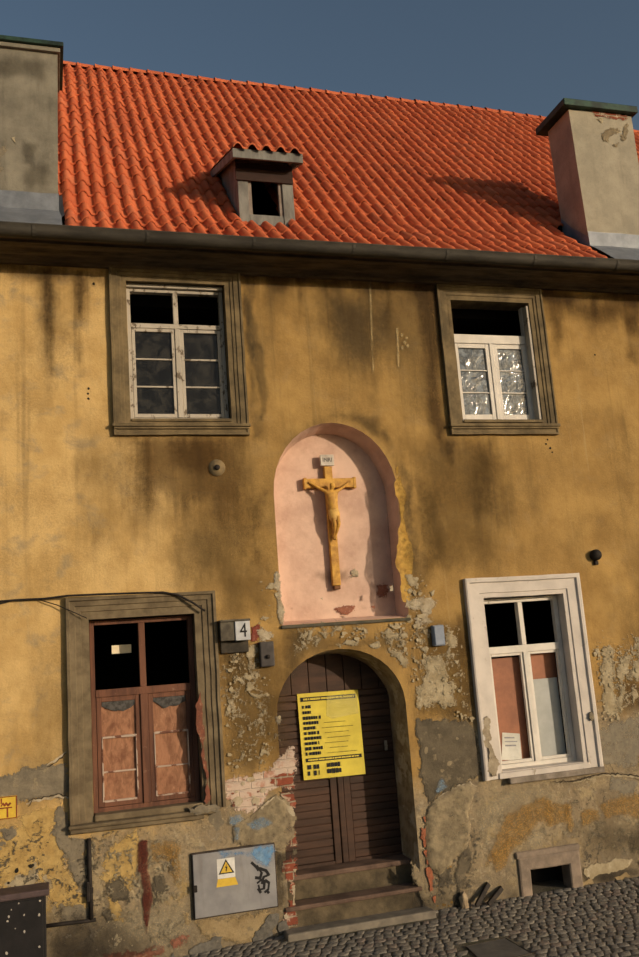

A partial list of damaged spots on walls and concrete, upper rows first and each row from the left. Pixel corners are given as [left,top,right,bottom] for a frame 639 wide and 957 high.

flaking render [592,111,629,147]
leakage [9,264,92,323]
flaking render [220,571,299,814]
peeling [294,574,500,780]
peeling [588,630,639,725]
peeling [195,681,224,831]
crack [554,765,639,783]
flaking render [0,802,223,957]
peeling [419,789,487,907]